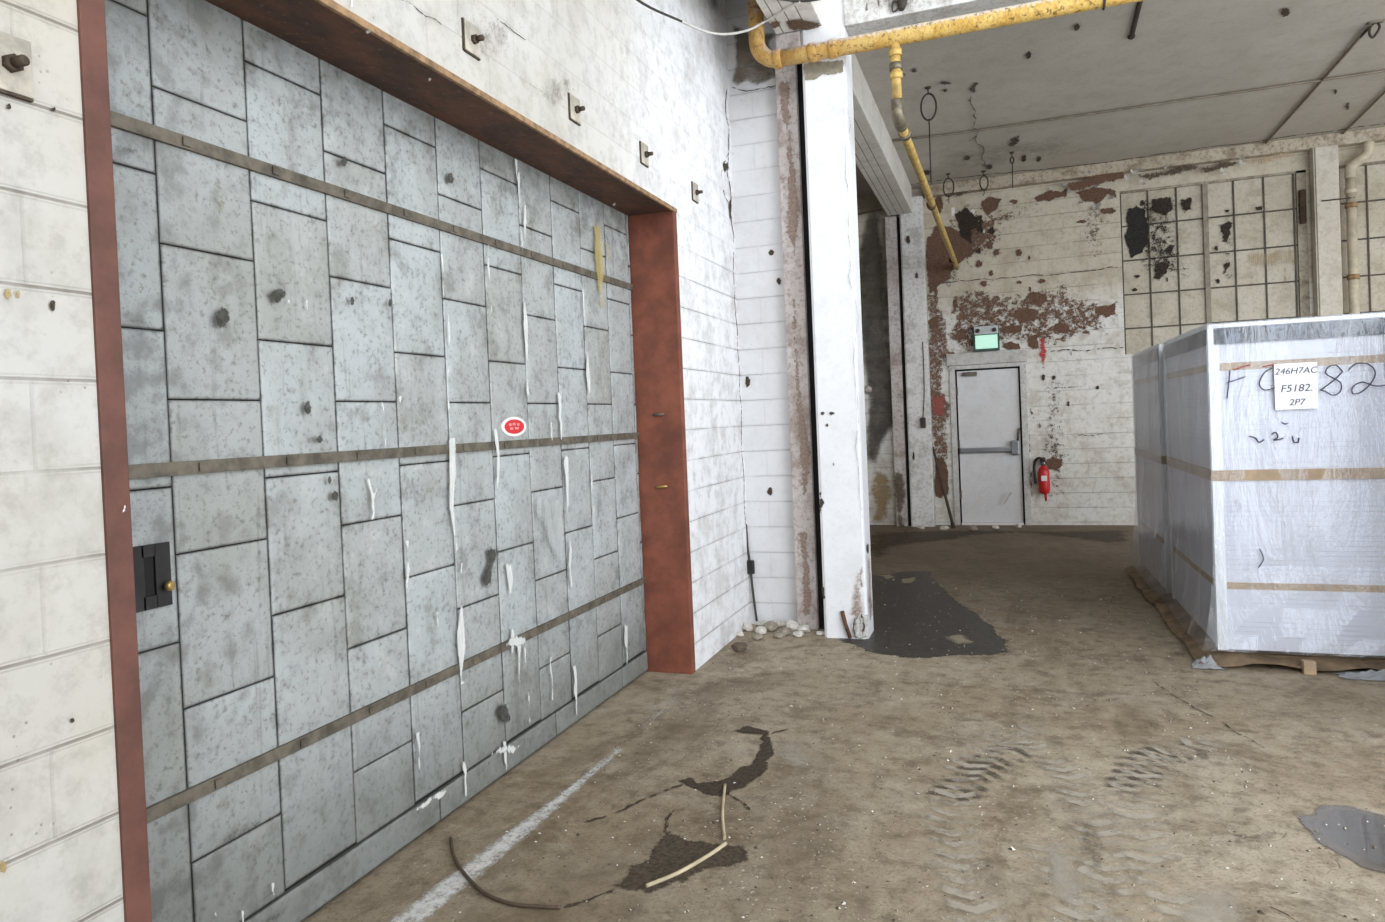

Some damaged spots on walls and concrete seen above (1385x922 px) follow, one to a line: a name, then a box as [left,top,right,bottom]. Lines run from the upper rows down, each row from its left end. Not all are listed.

peeling [1008,136,1042,162]
peeling [906,156,1245,498]
water stain [870,472,1128,557]
water stain [840,571,1008,658]